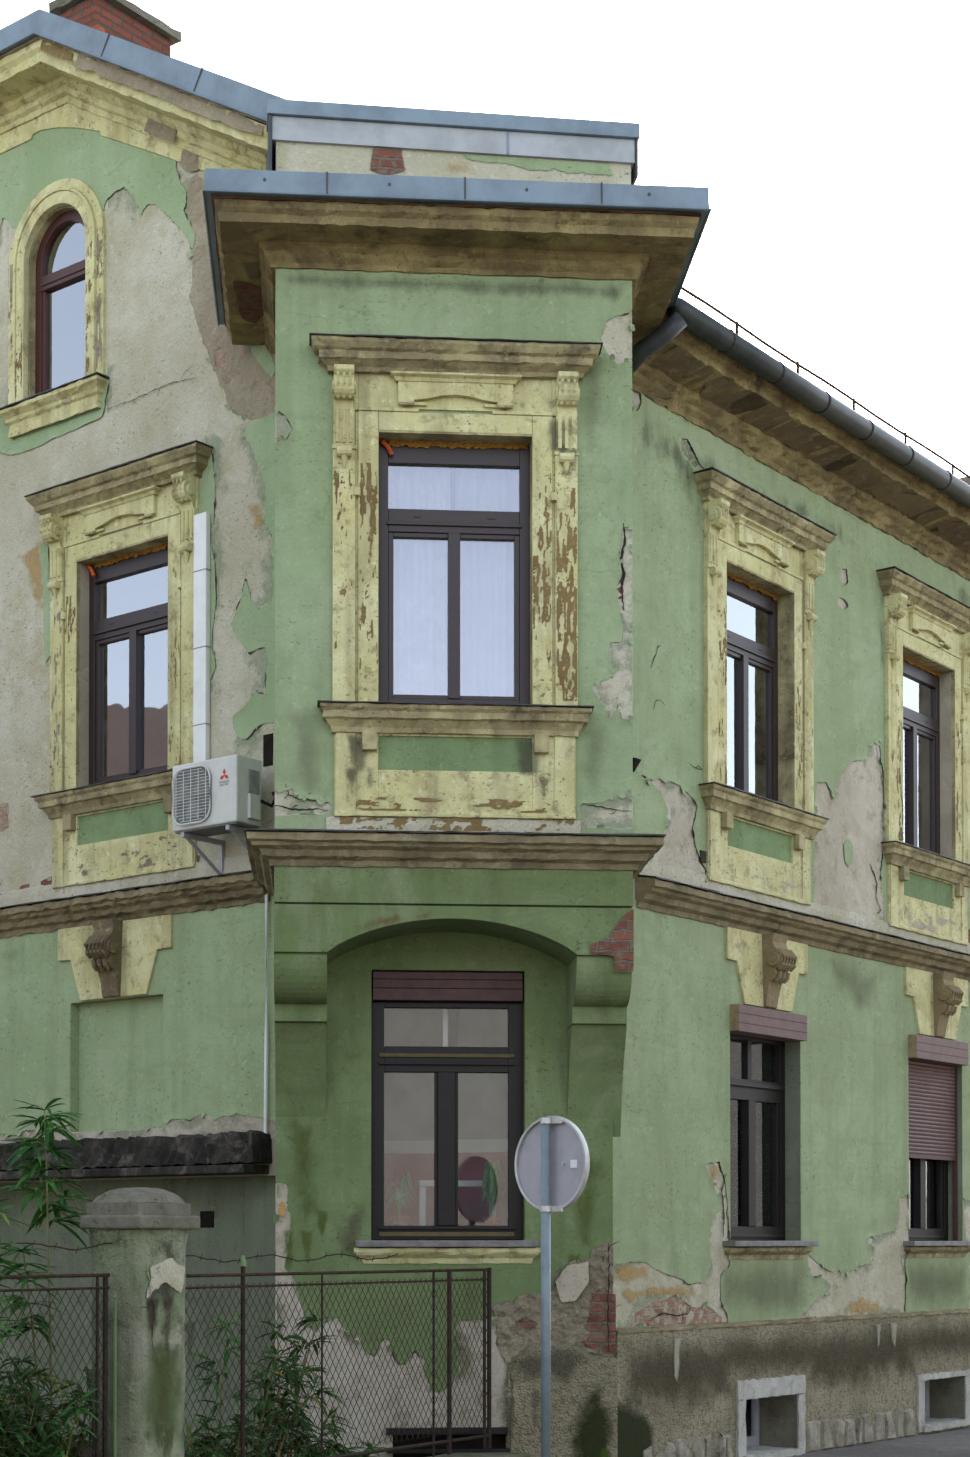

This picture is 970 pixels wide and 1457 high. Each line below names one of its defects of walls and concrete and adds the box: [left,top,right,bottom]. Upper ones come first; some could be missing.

peeling [0,118,707,909]
peeling [650,346,970,552]
peeling [719,605,727,685]
peeling [726,667,903,929]